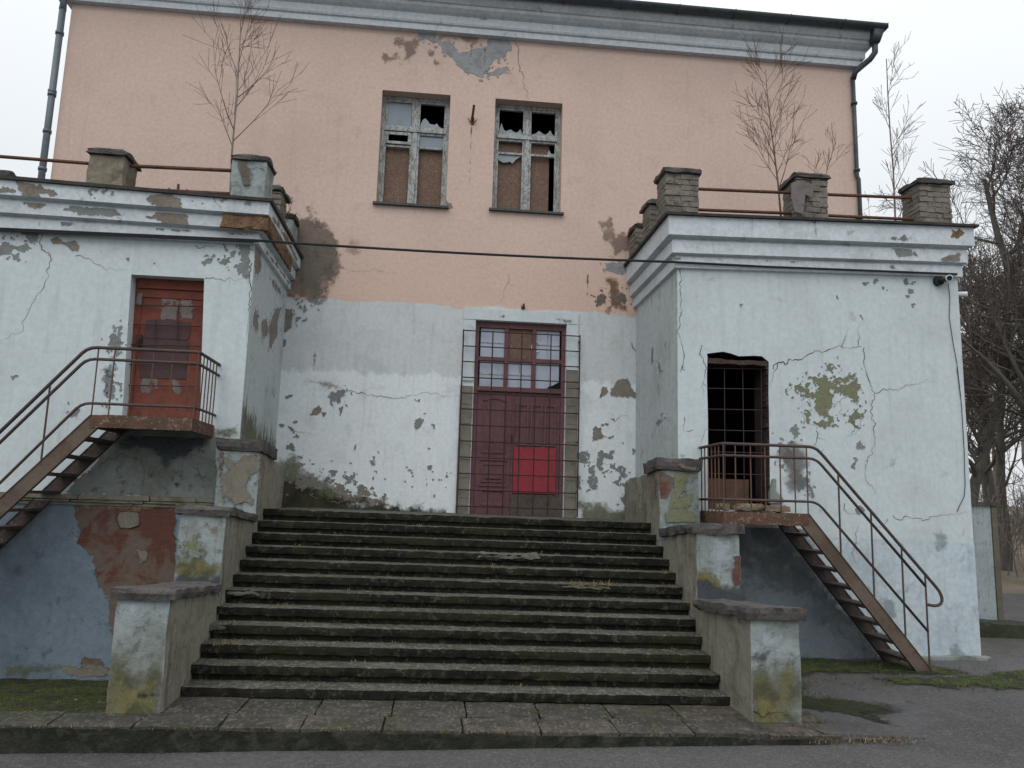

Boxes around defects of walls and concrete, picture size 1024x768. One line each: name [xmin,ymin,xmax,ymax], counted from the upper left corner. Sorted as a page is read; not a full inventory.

peeling [415,33,514,82]
peeling [0,187,121,262]
crack [5,234,122,339]
peeling [201,233,338,352]
water stain [287,210,341,302]
spalling [67,427,264,641]
spalling [279,420,388,505]
water stain [281,482,446,513]
peeling [576,418,636,509]
peeling [600,378,636,398]
peeling [772,356,867,499]
crack [770,322,930,492]